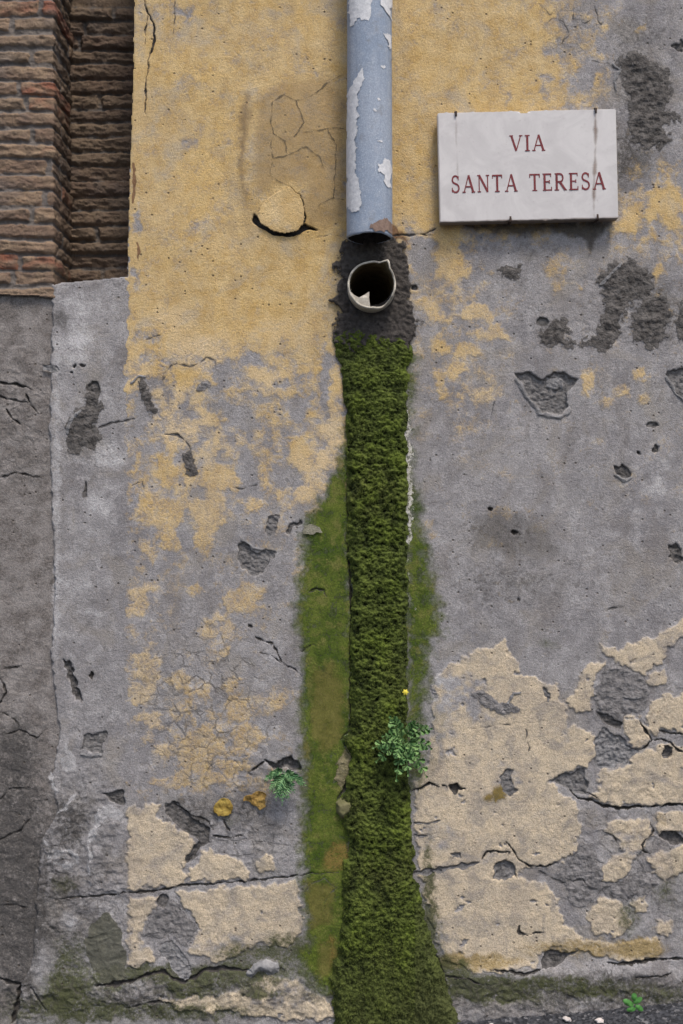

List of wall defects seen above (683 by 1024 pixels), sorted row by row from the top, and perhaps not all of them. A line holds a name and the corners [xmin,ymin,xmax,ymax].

crack [144,0,176,114]
flaking render [595,51,682,151]
crack [252,193,338,237]
flaking render [537,256,683,353]
flaking render [64,381,135,455]
water stain [404,410,414,544]
water stain [304,665,343,757]
flaking render [550,664,651,799]
crack [569,789,683,854]
crack [55,872,339,901]
crack [414,862,479,876]
flaking render [482,842,659,908]